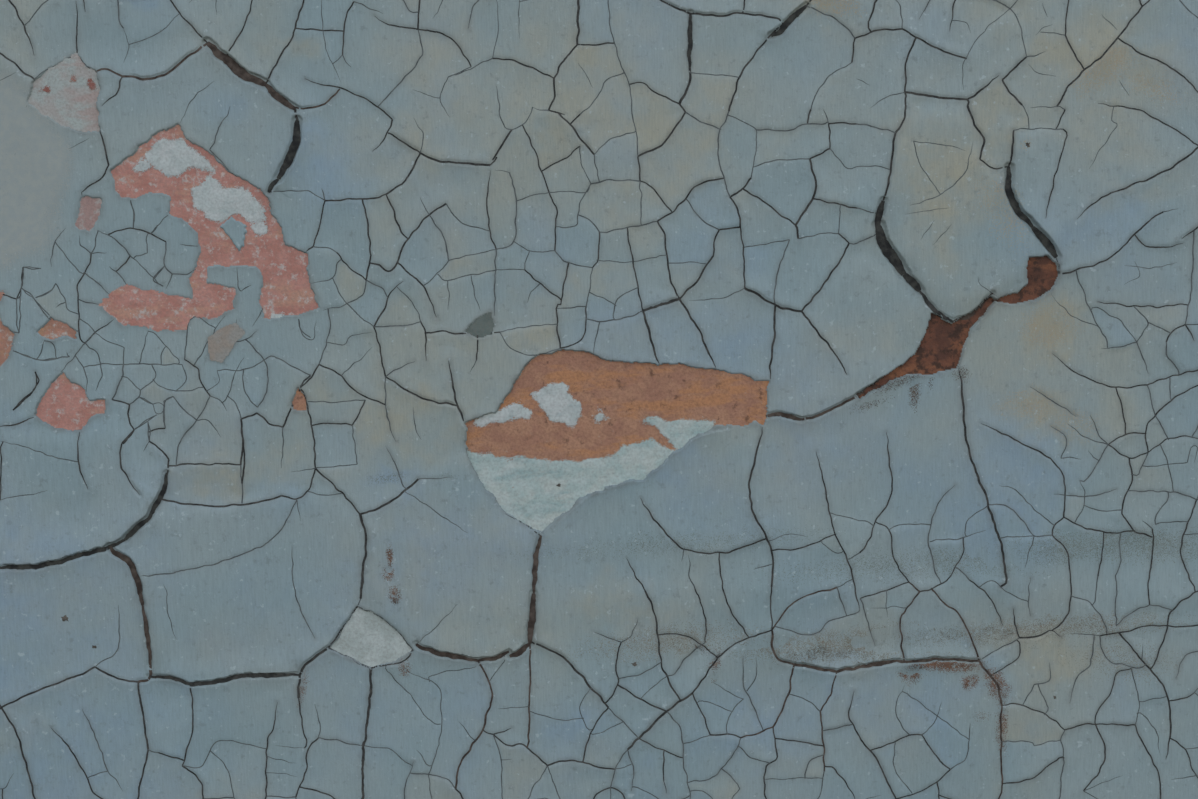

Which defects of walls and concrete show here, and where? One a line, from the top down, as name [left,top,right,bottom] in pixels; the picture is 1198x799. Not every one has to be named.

crack [69,4,90,69]
peeling [28,53,100,132]
crack [69,132,109,197]
peeling [75,196,102,232]
peeling [99,124,319,363]
peeling [0,318,15,366]
peeling [858,256,1058,398]
peeling [36,373,106,431]
peeling [465,349,769,532]
crack [0,228,460,799]
peeling [330,607,412,667]